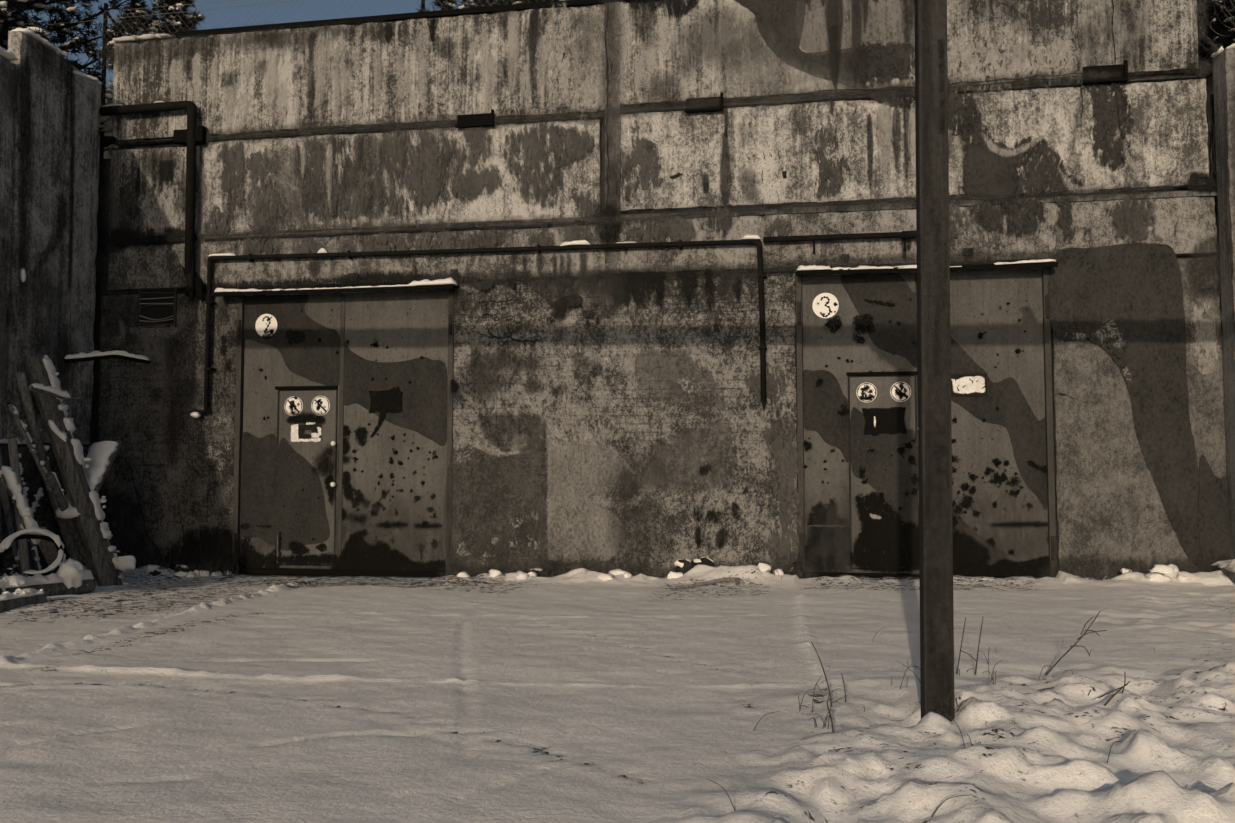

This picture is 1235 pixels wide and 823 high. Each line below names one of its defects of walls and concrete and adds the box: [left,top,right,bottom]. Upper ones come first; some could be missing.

damp [615,0,697,101]
damp [807,0,878,115]
damp [4,36,75,291]
damp [622,107,735,250]
damp [867,105,916,193]
damp [985,138,1040,156]
damp [949,176,1108,265]
damp [177,223,917,370]
damp [453,348,562,401]
damp [545,559,676,577]
damp [694,503,739,548]
damp [757,553,815,579]